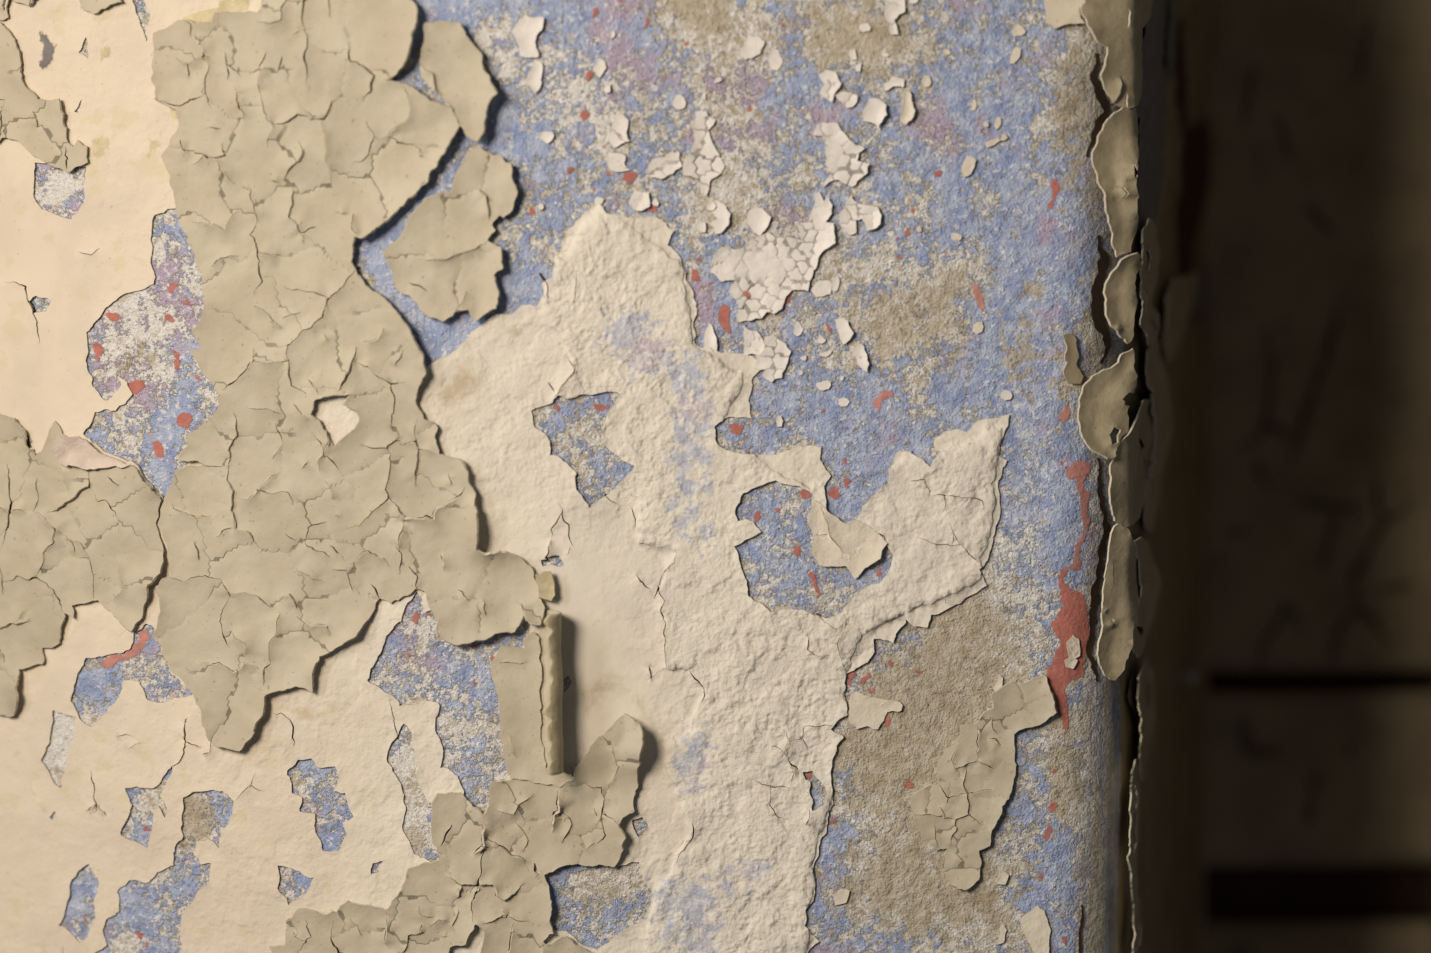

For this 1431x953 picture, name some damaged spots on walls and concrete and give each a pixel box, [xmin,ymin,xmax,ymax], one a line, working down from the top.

peeling [0,0,652,953]
spalling [353,0,1174,953]
peeling [1162,271,1198,363]